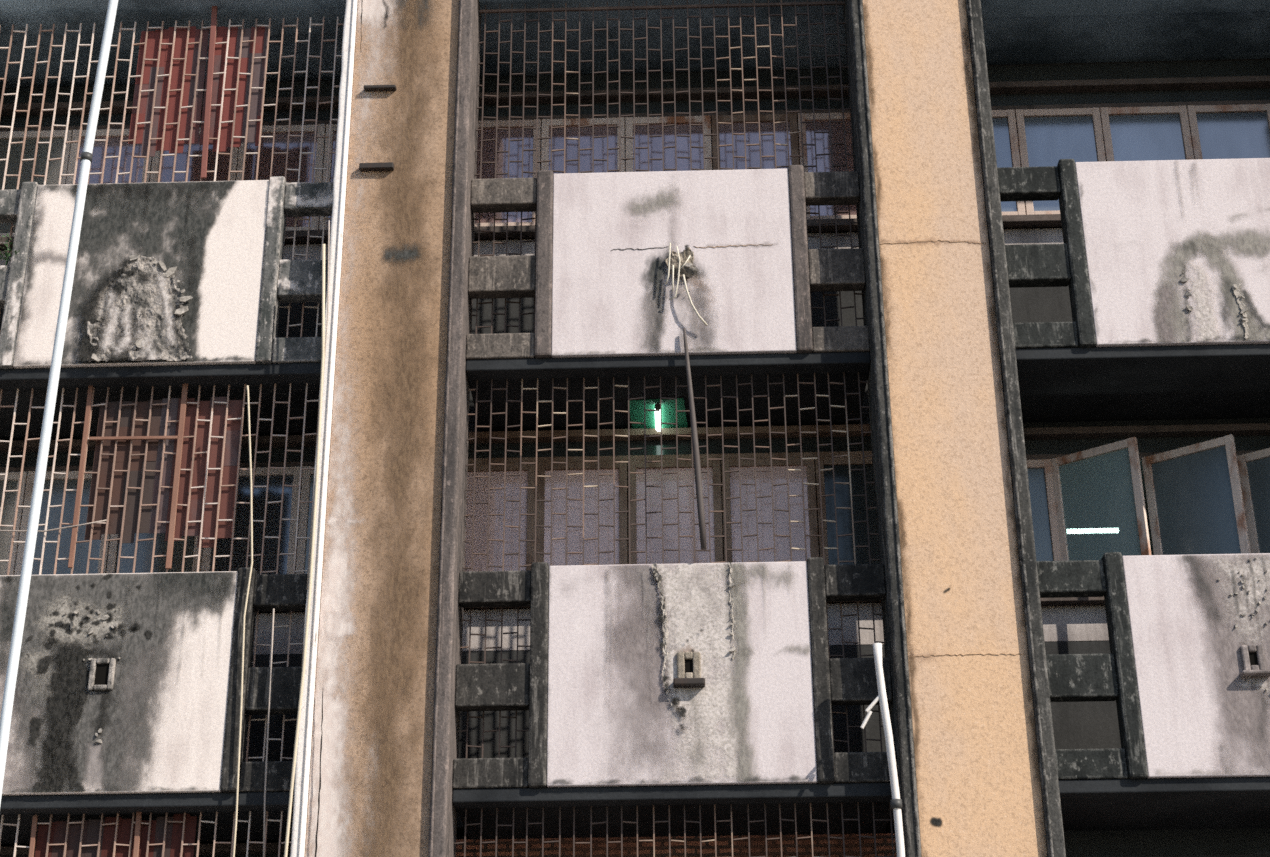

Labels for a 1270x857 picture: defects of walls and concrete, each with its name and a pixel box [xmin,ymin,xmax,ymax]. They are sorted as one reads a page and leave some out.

damp [357,0,404,76]
damp [21,181,238,364]
damp [644,252,713,351]
spalling [665,242,708,326]
crack [611,243,773,251]
damp [1156,230,1270,342]
peeling [25,574,152,693]
damp [0,572,236,792]
damp [306,387,356,857]
damp [613,565,671,762]
damp [726,563,789,782]
damp [1185,554,1270,771]